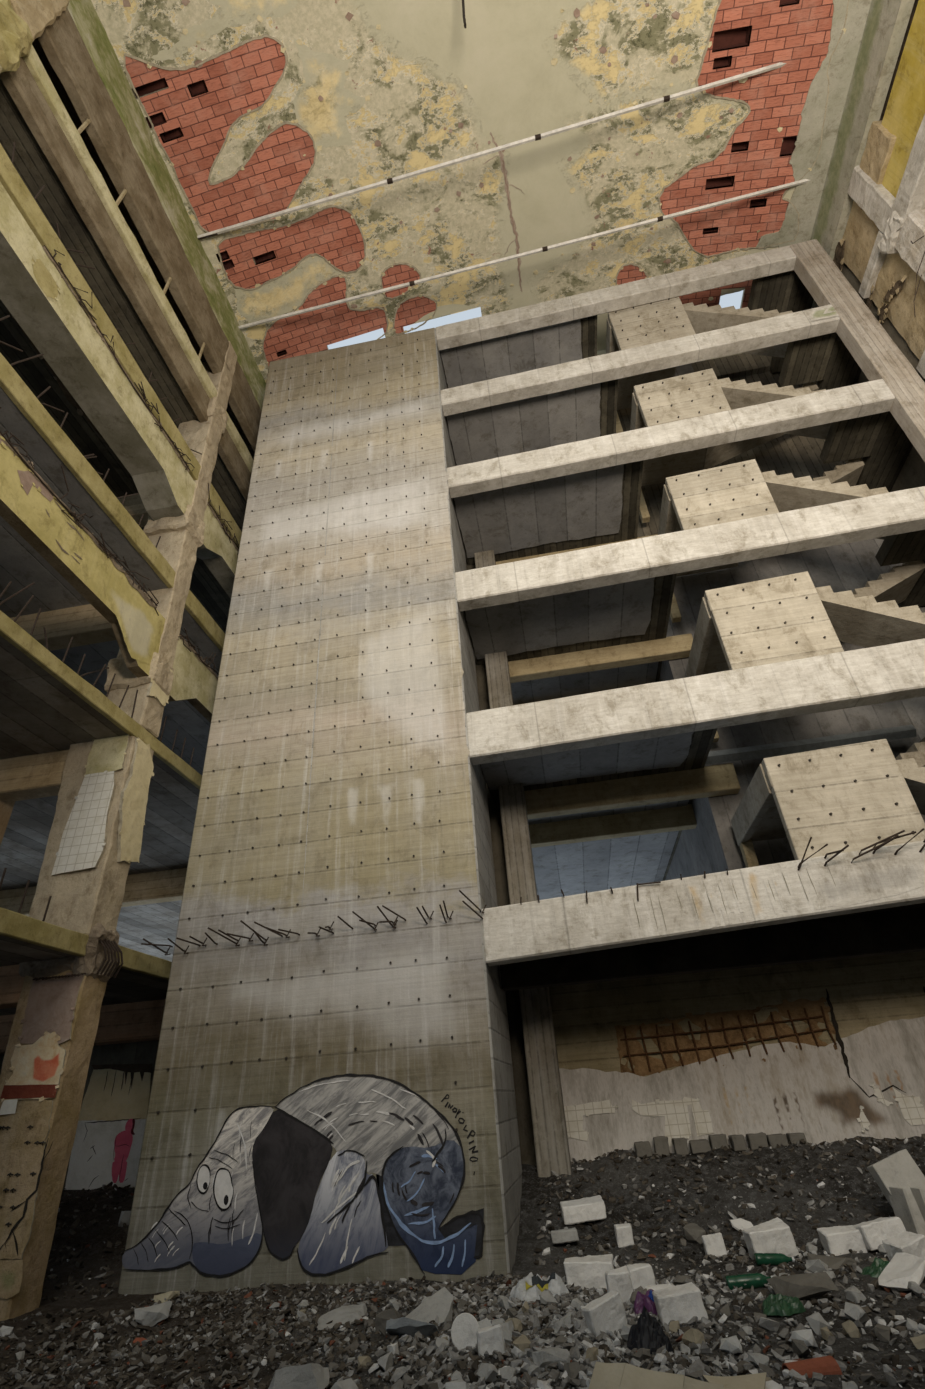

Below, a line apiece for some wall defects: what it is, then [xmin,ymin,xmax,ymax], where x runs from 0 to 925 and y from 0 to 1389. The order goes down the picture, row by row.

flaking render [91,0,871,382]
spalling [141,890,486,956]
spalling [614,997,837,1076]
crack [826,989,906,1098]
spalling [0,939,123,1260]
damp [770,1079,907,1137]
crack [0,1118,140,1255]